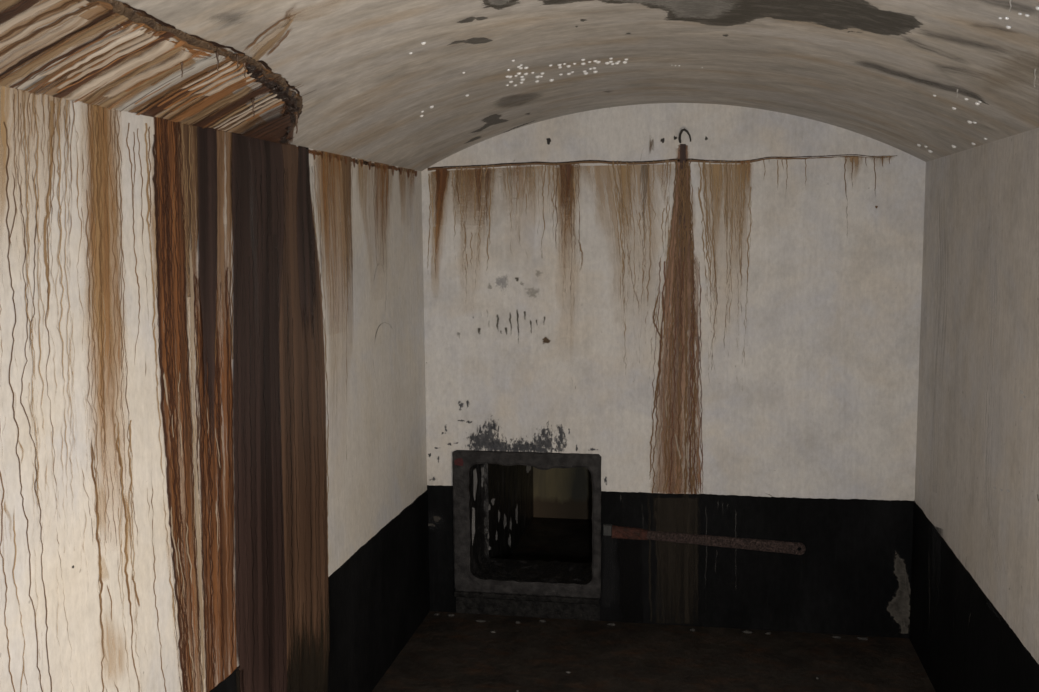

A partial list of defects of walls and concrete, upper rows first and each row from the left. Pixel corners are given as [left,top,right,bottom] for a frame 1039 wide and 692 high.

water stain [457,0,519,23]
water stain [540,0,923,37]
corrosion [844,156,891,197]
corrosion [297,140,752,494]
corrosion [0,86,237,692]
corrosion [603,524,806,555]
peeling [887,551,911,634]